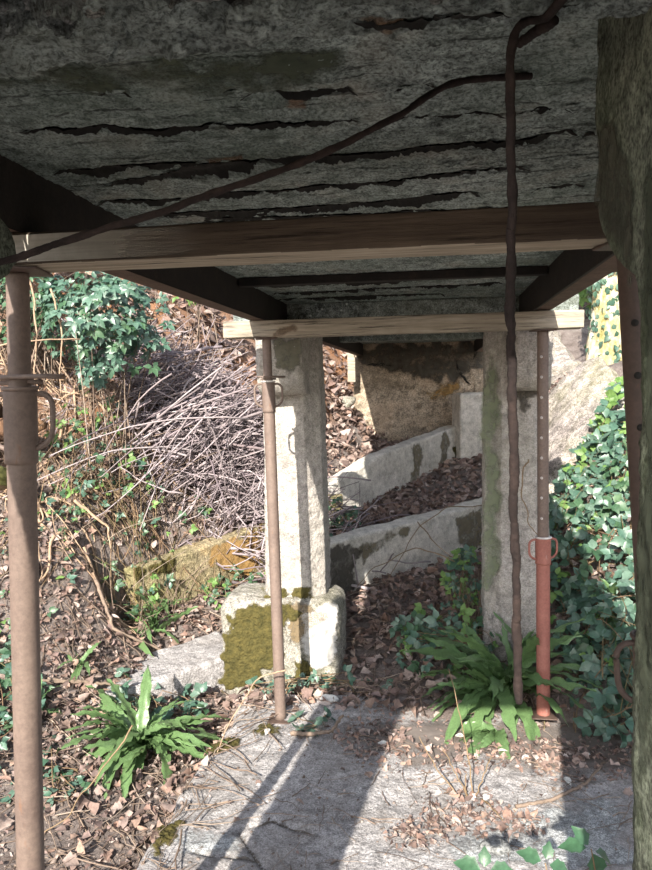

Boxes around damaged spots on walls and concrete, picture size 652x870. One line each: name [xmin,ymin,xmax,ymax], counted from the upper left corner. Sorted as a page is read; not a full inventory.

crack [338,9,528,31]
leakage [33,50,341,96]
crack [19,87,358,137]
crack [53,104,596,225]
spalling [0,0,575,705]